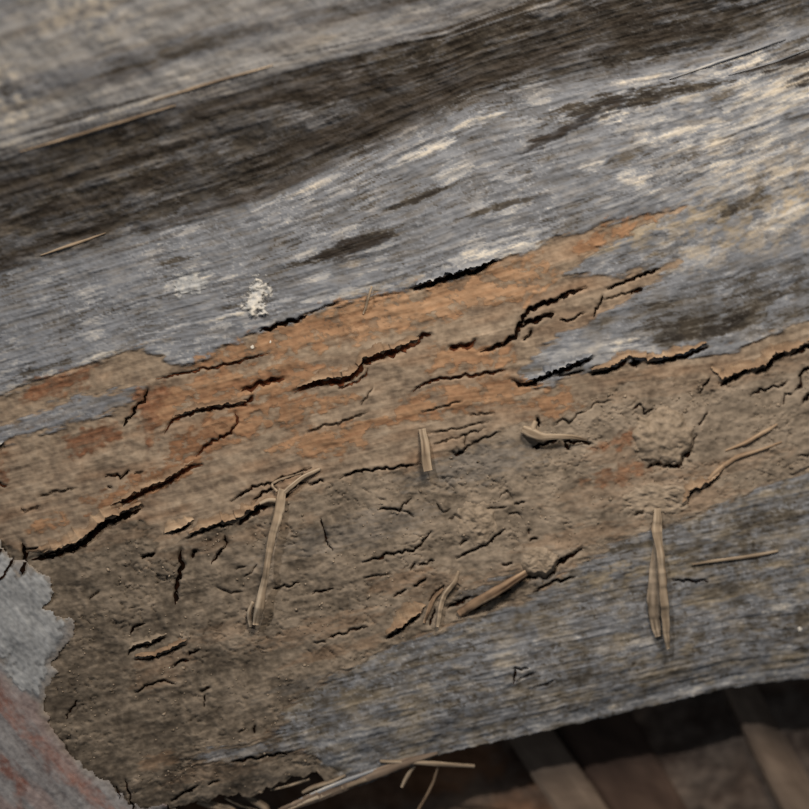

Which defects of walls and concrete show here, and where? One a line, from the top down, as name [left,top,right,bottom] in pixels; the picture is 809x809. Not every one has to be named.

leakage [241,274,272,317]
crack [259,303,337,332]
crack [413,260,498,290]
crack [449,269,659,352]
peeling [0,206,809,553]
crack [413,346,709,392]
crack [699,344,809,404]
crack [0,333,431,580]
crack [171,463,422,605]
crack [362,532,583,639]
peeling [128,633,187,657]
peeling [364,601,467,657]